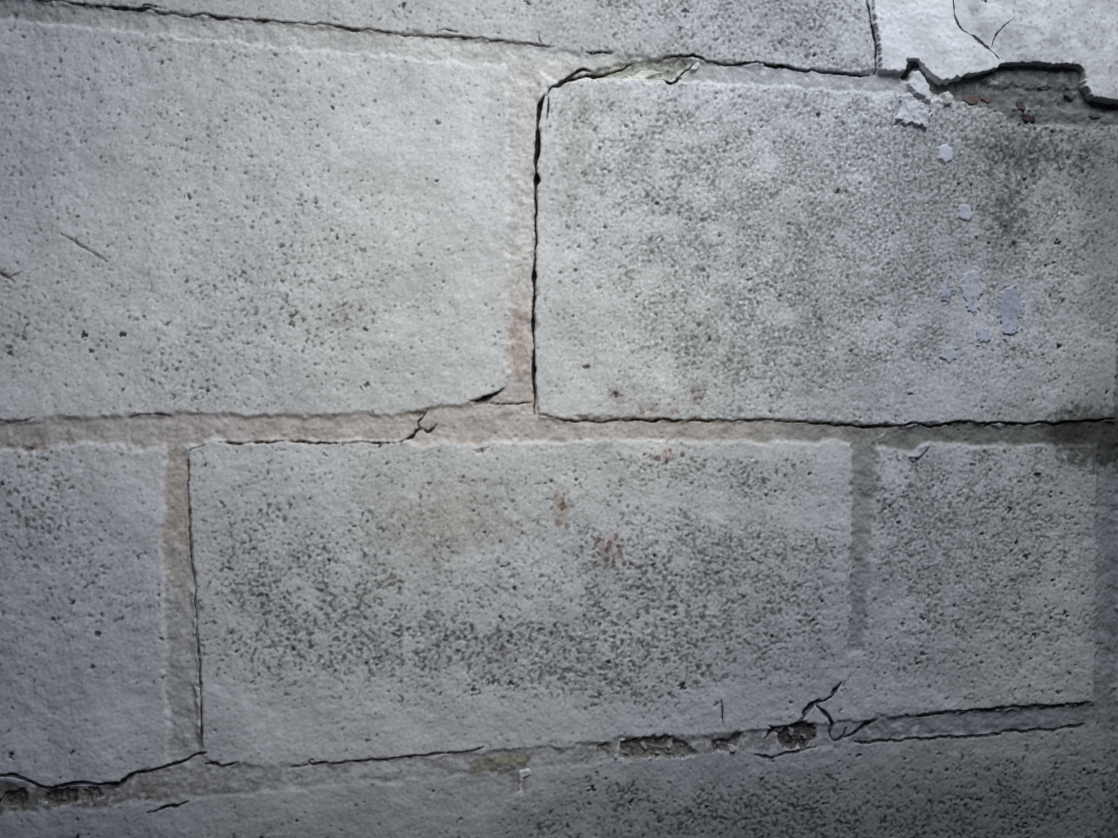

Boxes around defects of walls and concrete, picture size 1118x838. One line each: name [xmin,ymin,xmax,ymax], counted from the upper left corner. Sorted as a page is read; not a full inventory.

crack [37,0,554,47]
crack [663,0,877,85]
crack [953,0,1013,59]
peeling [869,0,1118,130]
crack [478,51,1104,428]
crack [0,413,435,801]
crack [294,747,483,767]
spalling [777,720,817,749]
crack [758,683,1088,759]